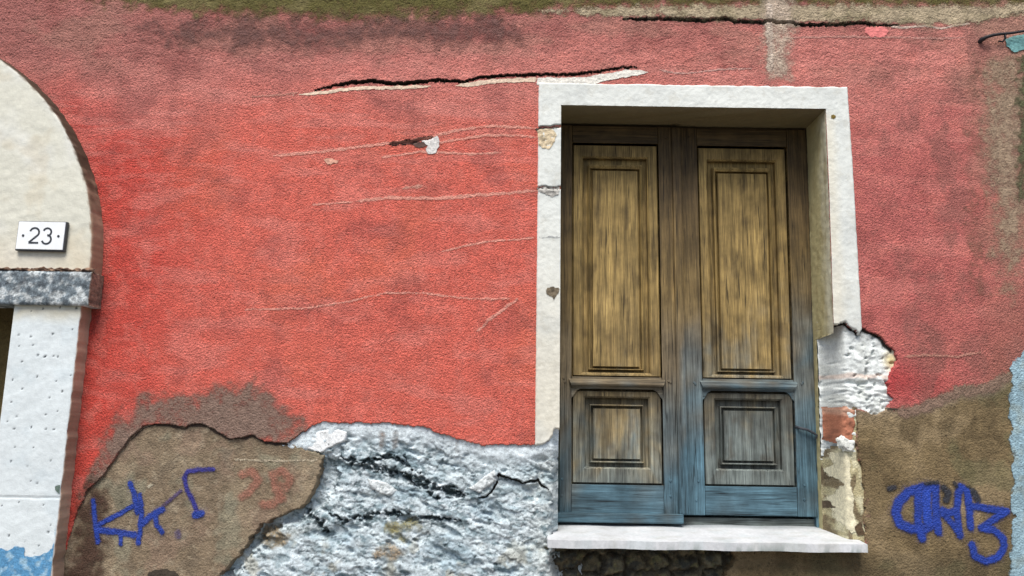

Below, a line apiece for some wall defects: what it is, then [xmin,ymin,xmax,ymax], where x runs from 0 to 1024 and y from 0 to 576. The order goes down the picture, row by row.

crack [251,65,752,98]
spalling [536,126,559,149]
crack [622,17,970,40]
damp [65,382,306,576]
spalling [64,421,582,576]
peeling [722,322,1024,576]